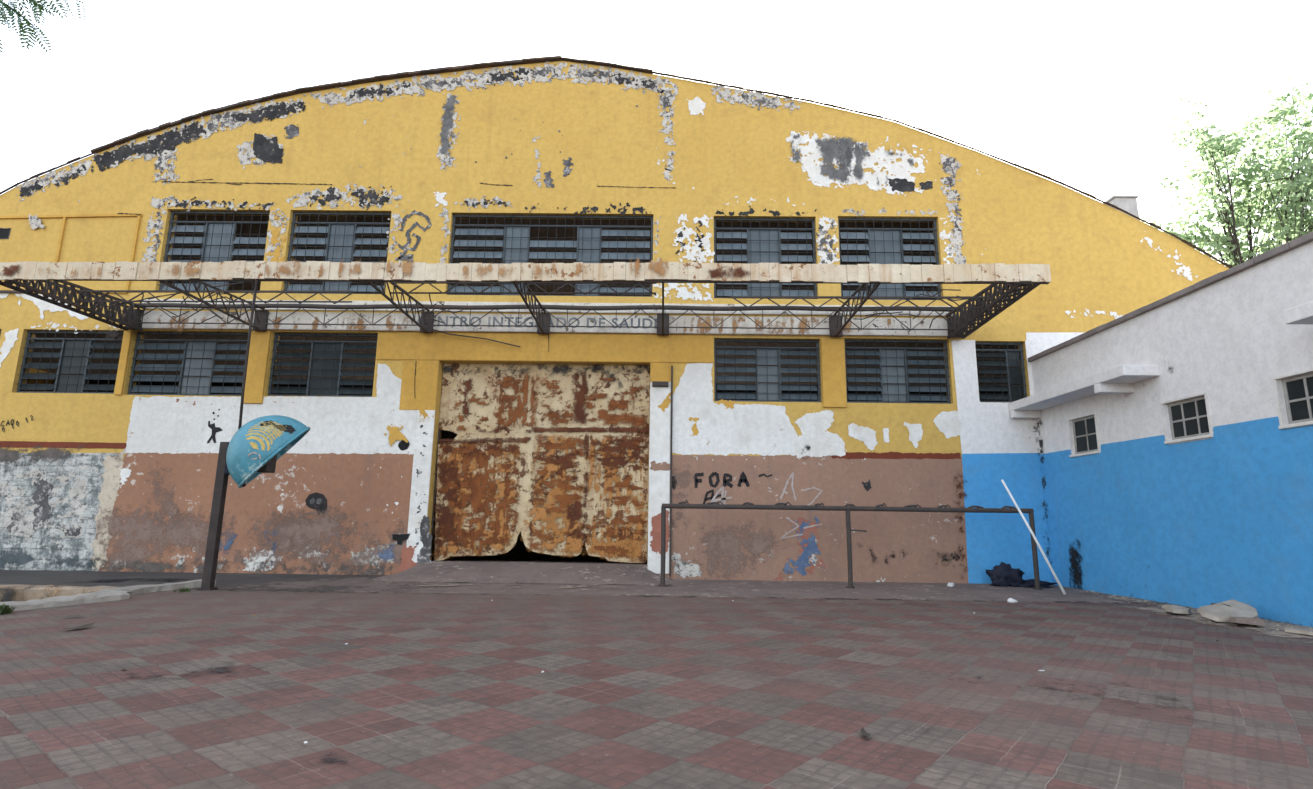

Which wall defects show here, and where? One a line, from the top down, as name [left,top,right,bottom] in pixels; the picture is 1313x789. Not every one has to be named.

peeling [154,148,180,185]
spalling [235,124,299,169]
peeling [436,93,461,171]
spalling [786,131,986,264]
rust [167,263,200,276]
rust [243,260,361,276]
rust [463,264,557,278]
rust [630,258,668,277]
rust [709,267,750,278]
peeling [793,410,961,461]
rust [434,364,649,561]
peeling [0,459,102,562]